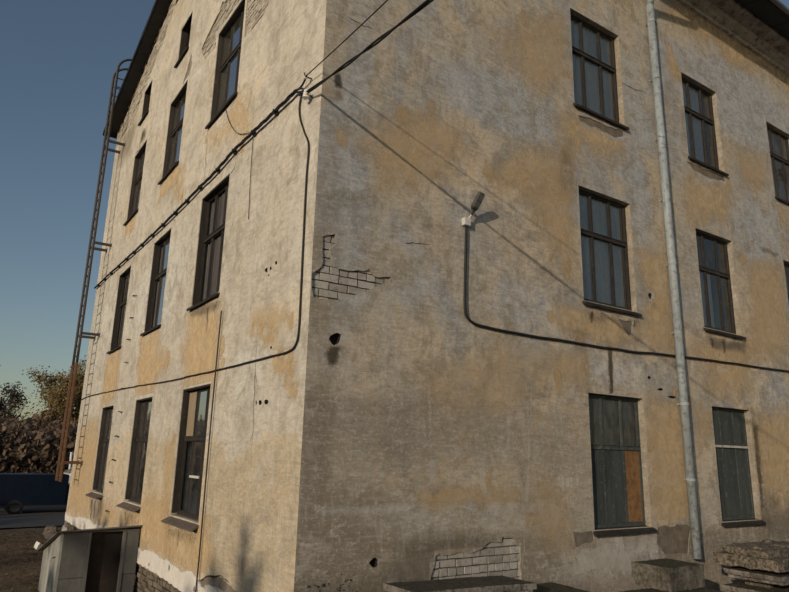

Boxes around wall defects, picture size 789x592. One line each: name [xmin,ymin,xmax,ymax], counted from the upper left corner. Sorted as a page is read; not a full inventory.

spalling [201,0,270,59]
spalling [312,234,391,300]
peeling [65,422,237,592]
spalling [430,537,522,580]